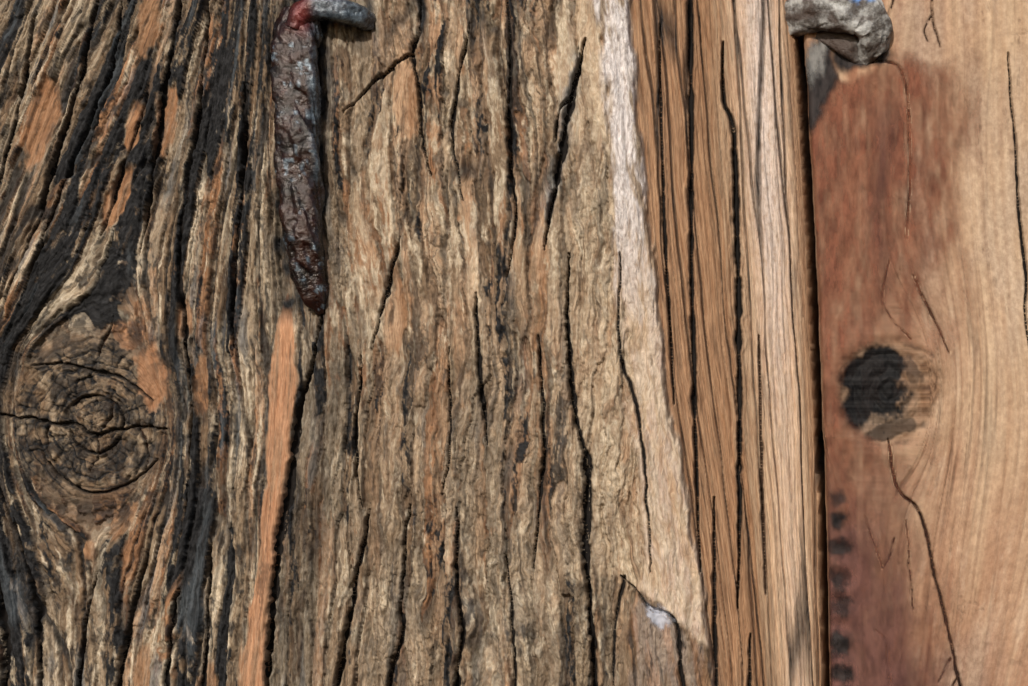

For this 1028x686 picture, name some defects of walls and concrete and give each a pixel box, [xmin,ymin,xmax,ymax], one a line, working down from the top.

crack [3,328,168,493]
crack [101,1,183,236]
crack [164,590,181,686]
crack [176,177,191,389]
crack [201,558,213,686]
crack [505,556,517,686]
crack [534,338,547,569]
crack [546,43,585,244]
crack [566,255,598,686]
crack [659,0,766,686]
crack [868,440,961,686]
crack [1007,54,1028,340]